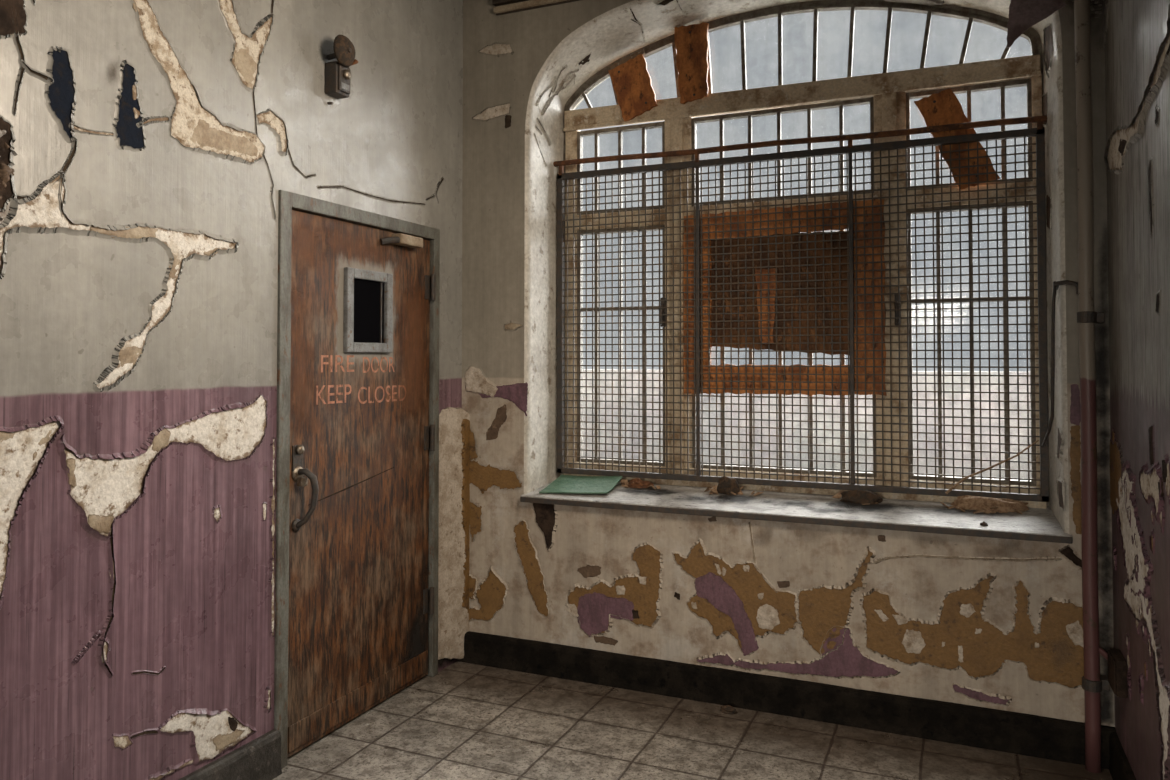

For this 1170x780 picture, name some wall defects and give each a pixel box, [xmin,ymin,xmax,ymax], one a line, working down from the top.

peeling [129,0,289,165]
peeling [1006,0,1066,127]
peeling [1104,15,1170,175]
peeling [0,156,239,392]
peeling [464,365,528,416]
peeling [0,394,276,639]
flaking render [532,503,558,552]
flaking render [1056,545,1082,570]
peeling [1109,423,1170,780]
peeling [110,733,133,751]
peeling [145,708,257,780]